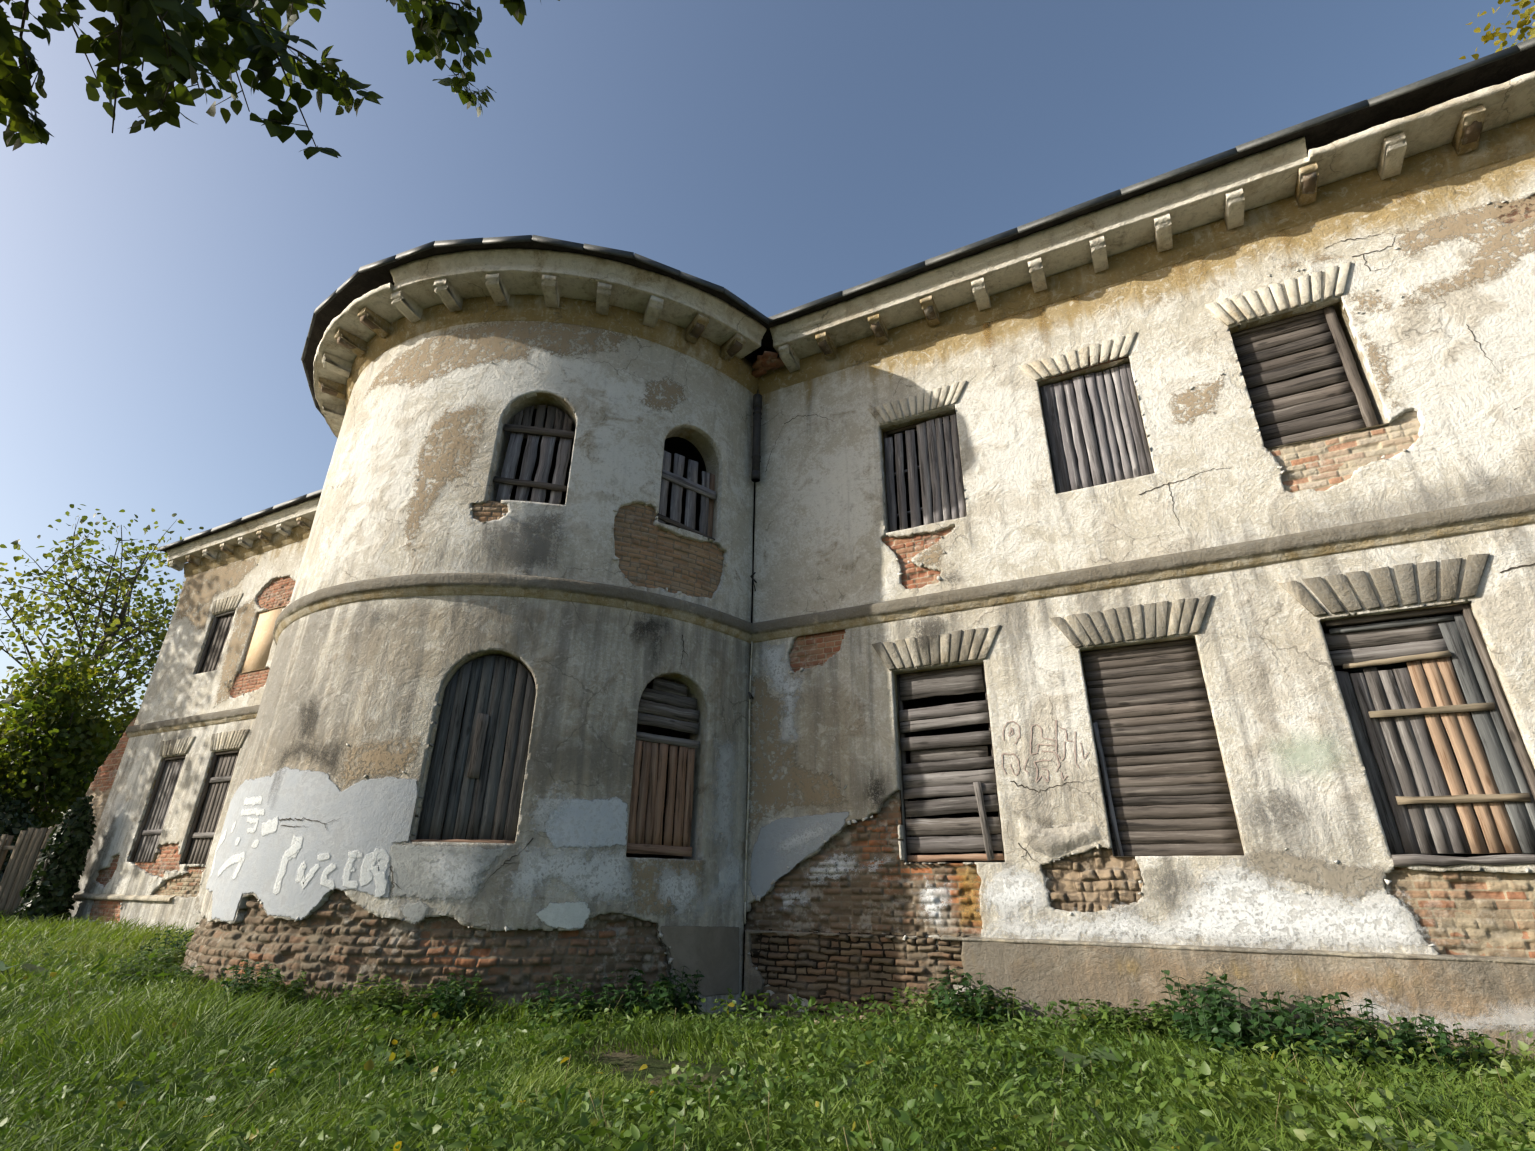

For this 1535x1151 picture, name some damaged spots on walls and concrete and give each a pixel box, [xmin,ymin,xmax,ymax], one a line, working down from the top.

crack [1324,229,1396,271]
flaking render [1267,194,1535,493]
flaking render [176,558,258,631]
flaking render [610,503,728,599]
flaking render [882,527,955,589]
crack [1500,563,1535,573]
flaking render [213,576,296,707]
flaking render [789,629,846,674]
flaking render [341,738,420,787]
flaking render [88,790,1002,1018]
flaking render [1042,844,1143,915]
flaking render [1248,848,1535,958]